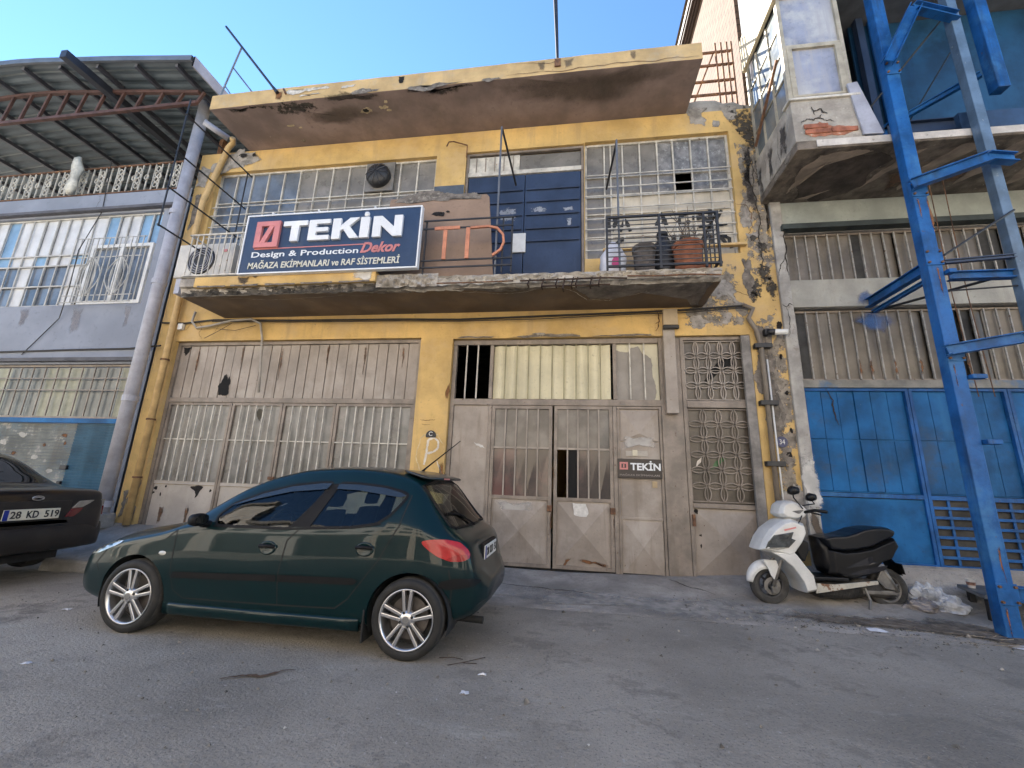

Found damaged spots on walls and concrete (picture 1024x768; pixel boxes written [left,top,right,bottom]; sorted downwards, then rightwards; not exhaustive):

spalling [408,81,462,91]
peeling [287,84,392,114]
spalling [687,104,737,127]
crack [801,107,833,123]
flaking render [804,122,859,137]
peeling [182,143,823,550]